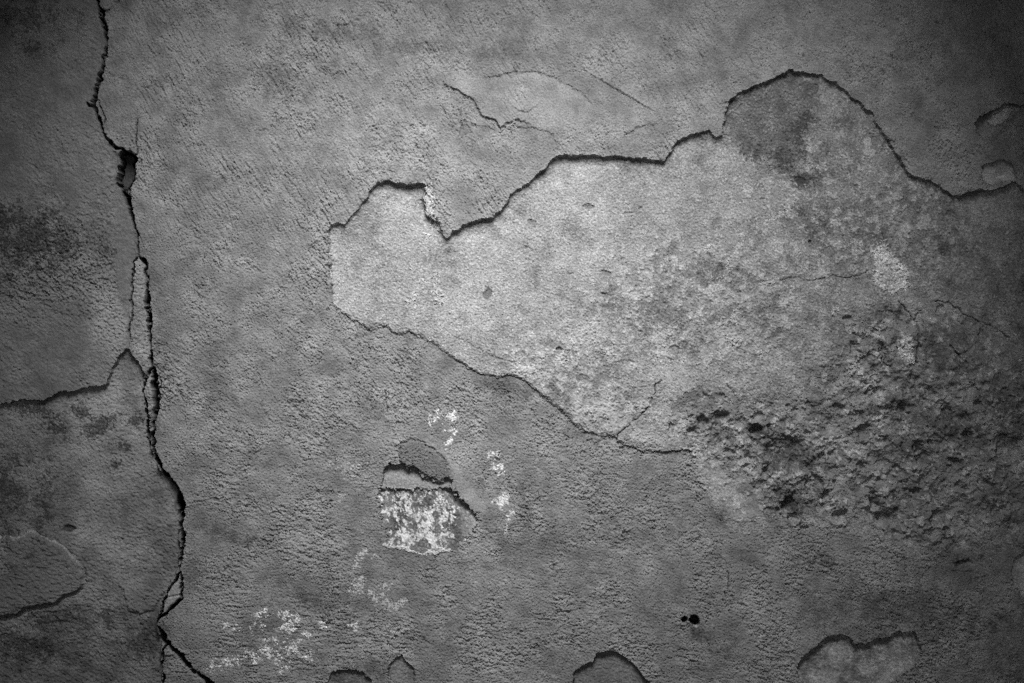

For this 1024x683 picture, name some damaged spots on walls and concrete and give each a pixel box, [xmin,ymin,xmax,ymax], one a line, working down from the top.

crack [86,100,139,198]
flaking render [326,69,1024,603]
crack [129,255,214,683]
flaking render [573,650,651,683]
flaking render [797,630,922,683]